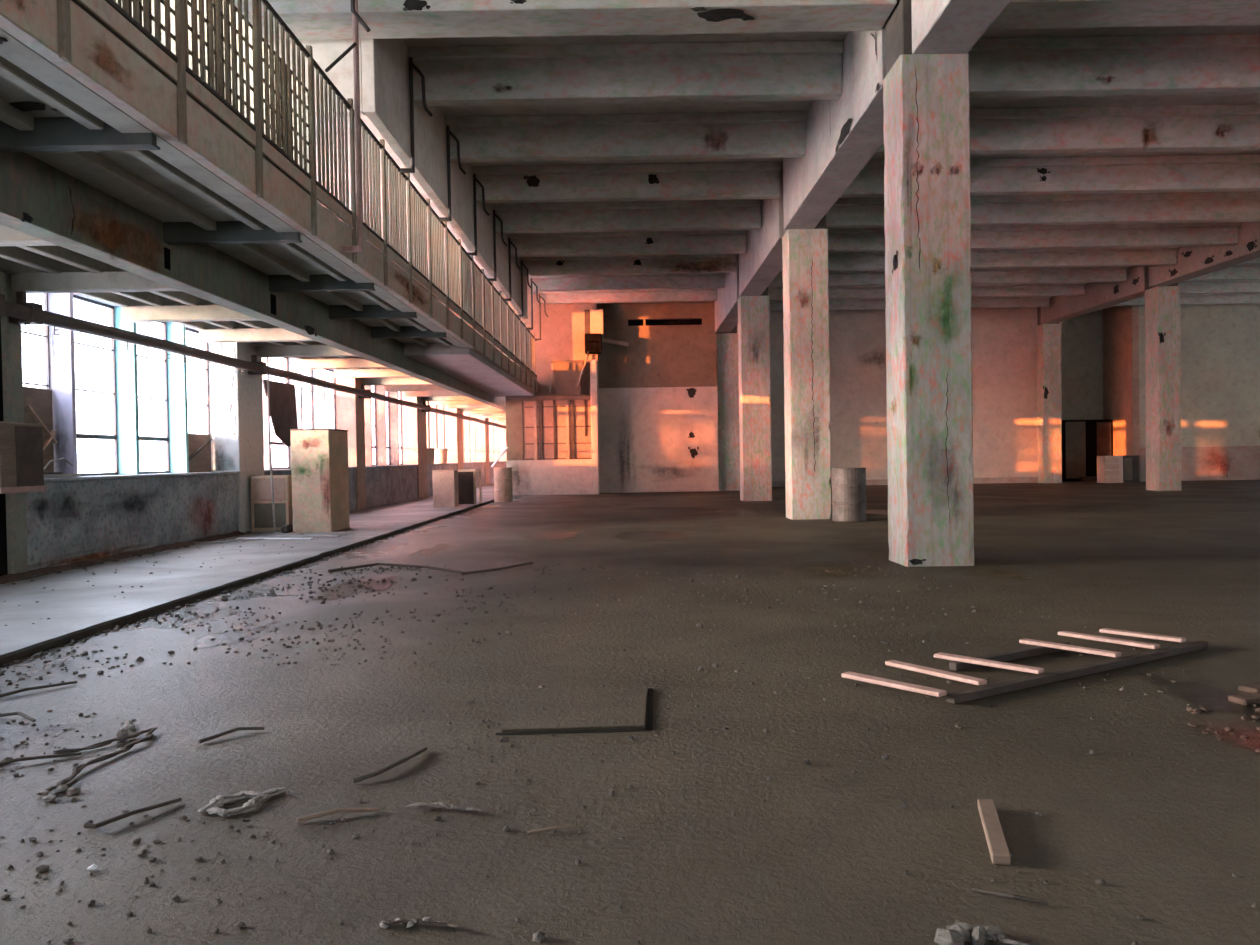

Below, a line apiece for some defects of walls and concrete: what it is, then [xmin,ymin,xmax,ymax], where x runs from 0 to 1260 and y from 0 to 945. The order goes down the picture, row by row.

spalling [403,0,431,11]
spalling [690,7,755,22]